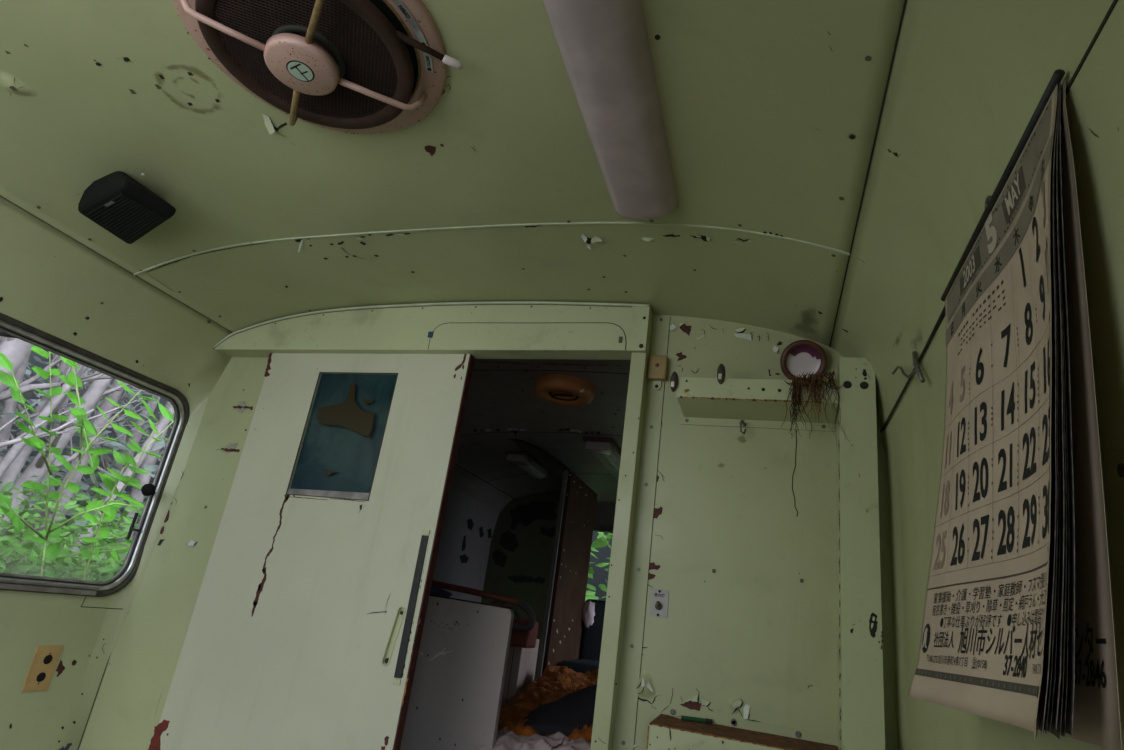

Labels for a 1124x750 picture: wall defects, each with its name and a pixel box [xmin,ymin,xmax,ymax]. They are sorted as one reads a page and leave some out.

peeling [580,233,604,249]
peeling [669,322,692,335]
peeling [734,328,782,353]
crack [248,494,295,623]
peeling [664,690,713,711]
peeling [727,697,760,722]
peeling [148,697,170,750]